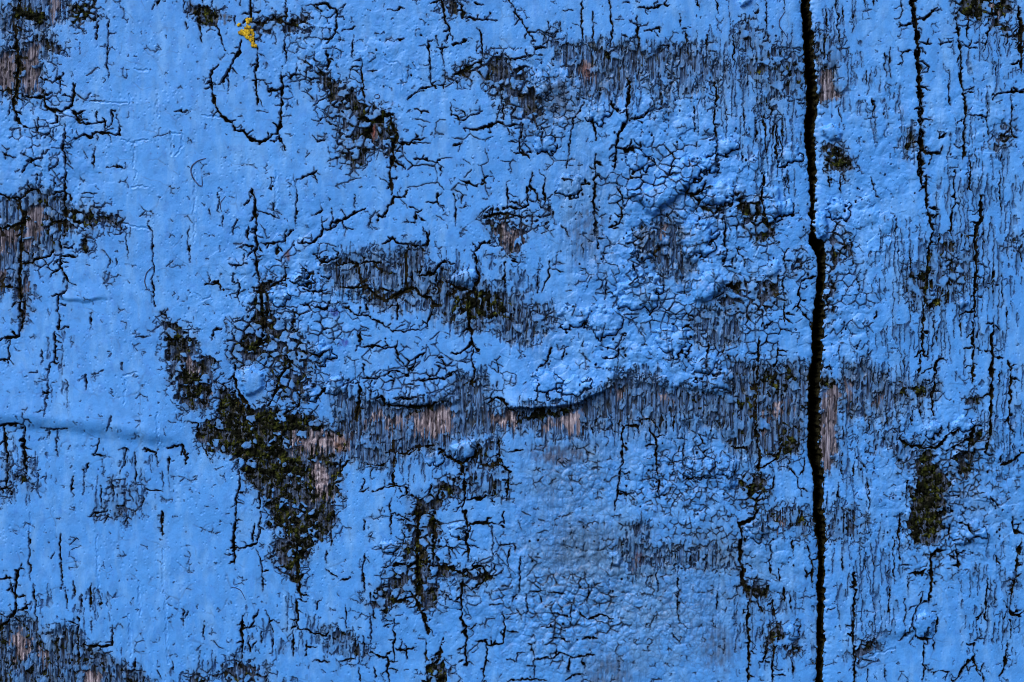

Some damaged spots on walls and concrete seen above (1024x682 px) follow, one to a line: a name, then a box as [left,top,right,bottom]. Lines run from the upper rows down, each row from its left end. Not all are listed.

peeling [0,0,99,101]
peeling [304,61,400,172]
peeling [445,52,549,138]
peeling [547,37,728,116]
peeling [739,18,842,117]
peeling [0,189,124,318]
peeling [329,247,556,344]
peeling [486,206,554,255]
crack [205,0,1024,682]
peeling [163,277,992,617]
peeling [0,616,145,682]